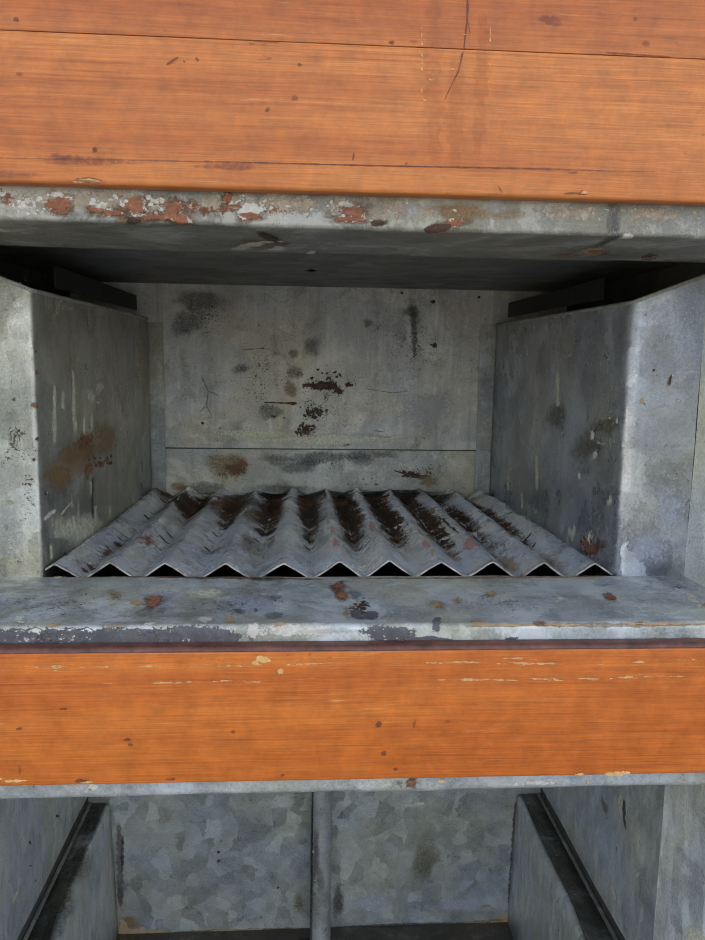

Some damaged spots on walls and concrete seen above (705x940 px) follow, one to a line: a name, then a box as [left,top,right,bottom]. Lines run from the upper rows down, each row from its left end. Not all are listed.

crack [445,0,470,99]
peeling [0,177,511,221]
rust [153,307,529,560]
rust [332,581,349,618]
peeling [0,616,246,643]